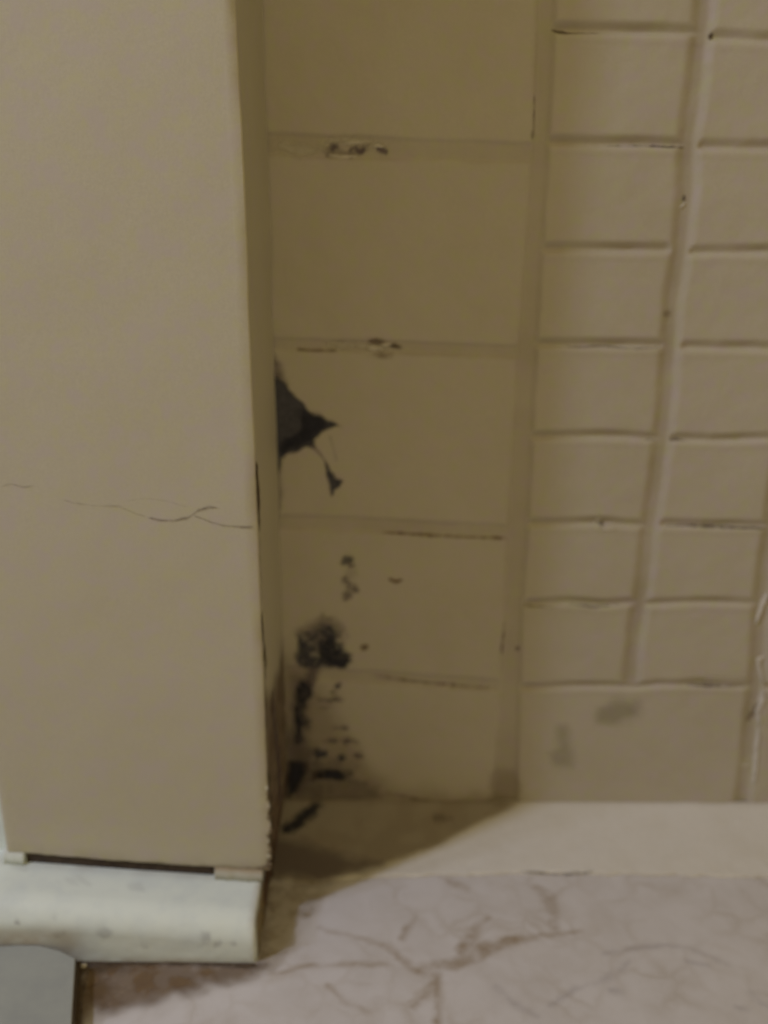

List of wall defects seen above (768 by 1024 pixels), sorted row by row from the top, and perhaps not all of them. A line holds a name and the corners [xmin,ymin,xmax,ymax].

damp [295,626,351,743]
damp [288,727,361,794]
damp [282,803,319,833]